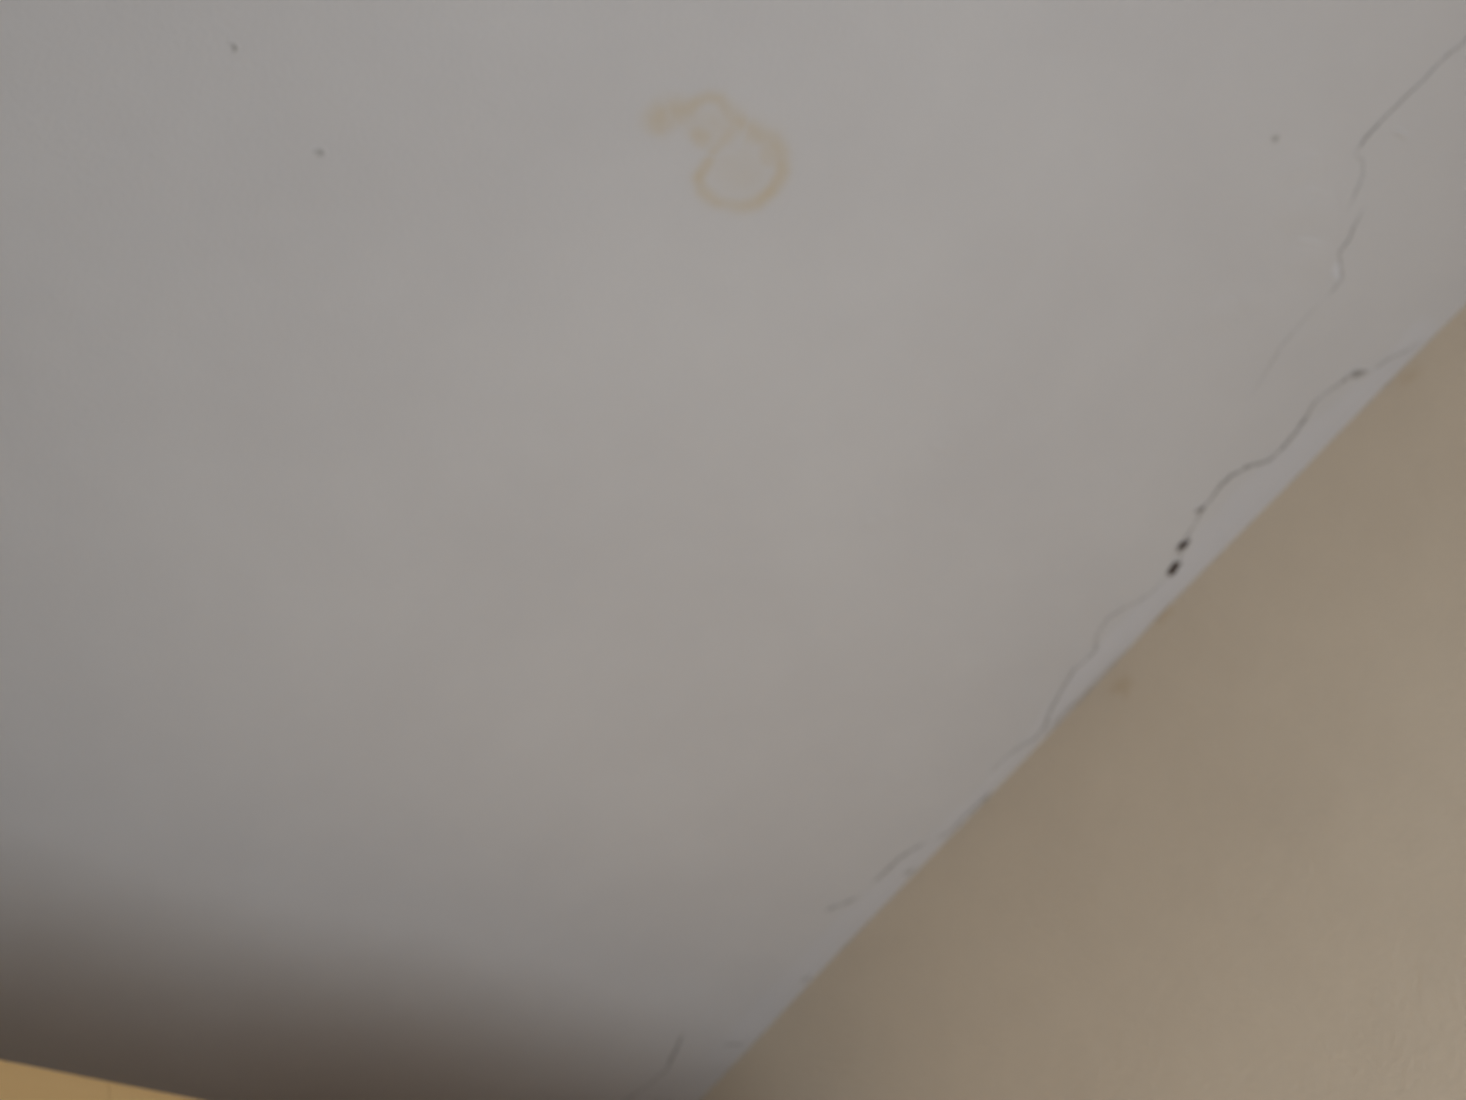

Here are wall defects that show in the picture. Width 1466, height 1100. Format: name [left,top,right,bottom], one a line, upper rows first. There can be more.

water stain [632,82,806,226]
crack [820,338,1424,914]